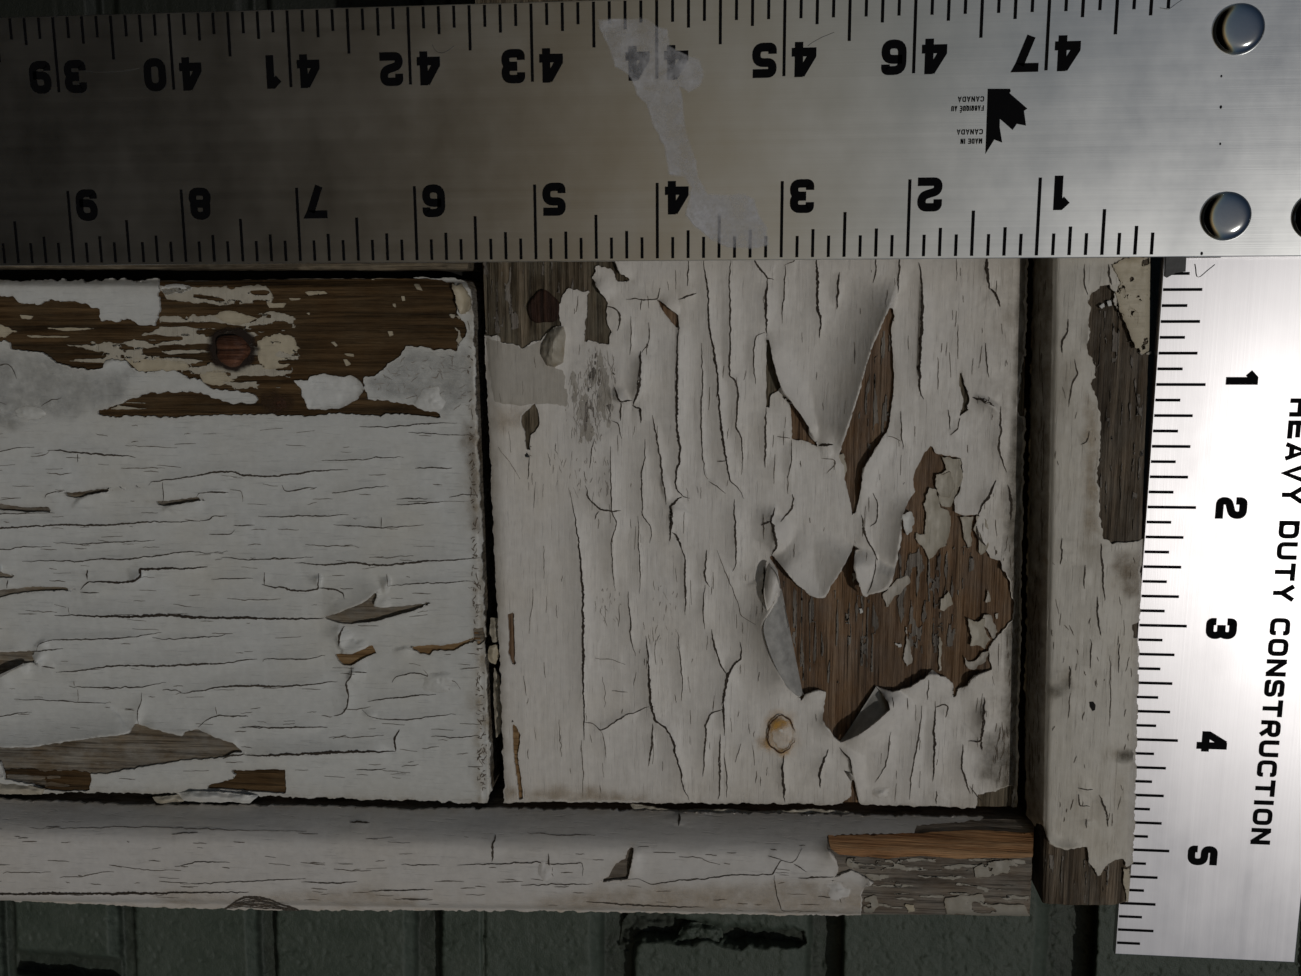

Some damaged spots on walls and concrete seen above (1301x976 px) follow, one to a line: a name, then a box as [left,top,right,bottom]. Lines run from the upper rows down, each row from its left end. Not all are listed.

corrosion [207,328,259,372]
peeling [0,261,629,449]
peeling [766,339,817,446]
peeling [839,308,894,513]
peeling [1087,257,1150,544]
peeling [0,651,38,674]
peeling [0,724,286,804]
peeling [326,593,428,624]
peeling [413,613,523,799]
peeling [770,446,1014,741]
peeling [603,847,634,881]
peeling [827,785,1131,916]